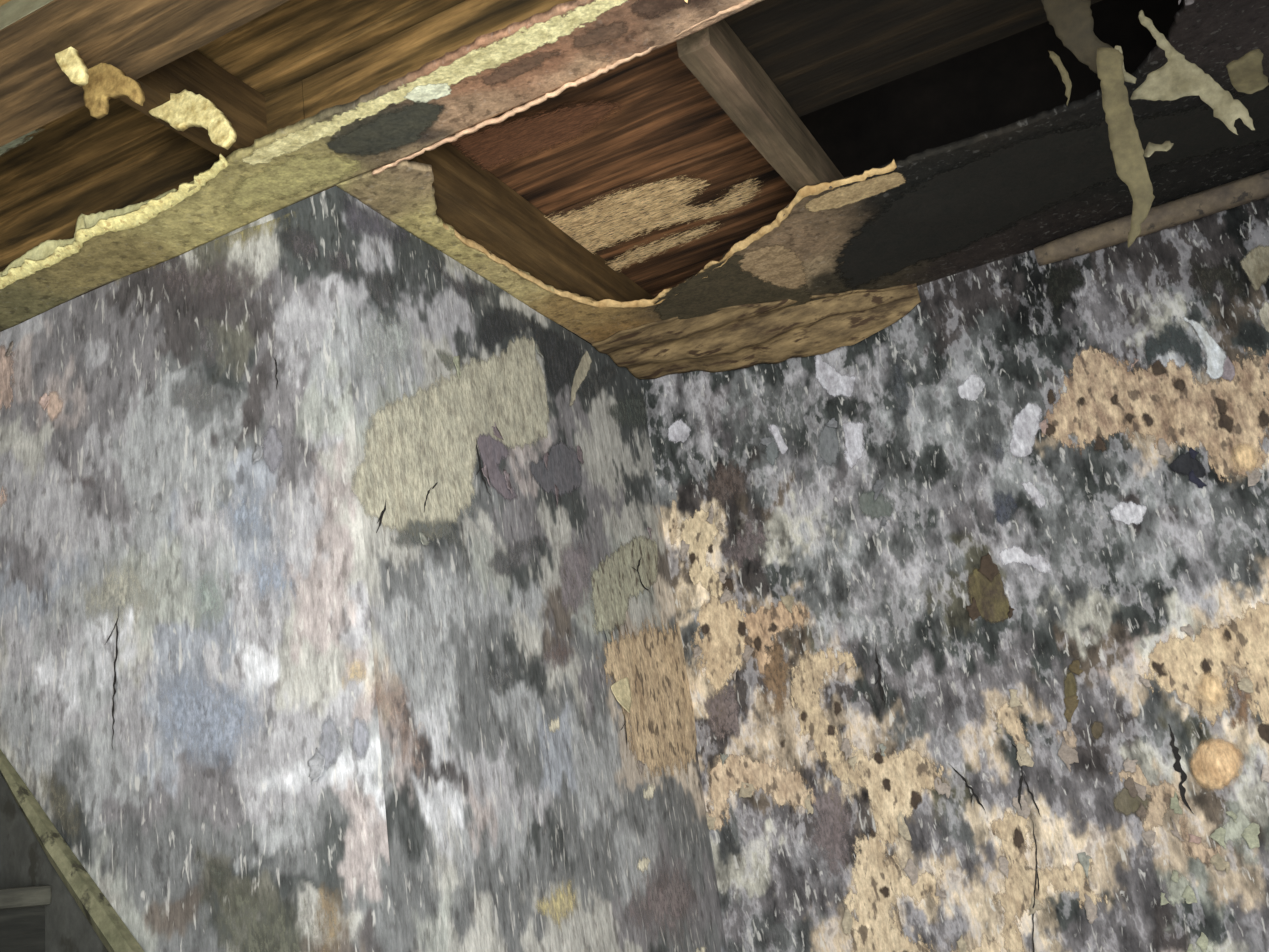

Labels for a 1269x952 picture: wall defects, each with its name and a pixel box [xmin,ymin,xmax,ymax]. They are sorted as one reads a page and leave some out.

peeling [351,337,584,545]
peeling [1010,318,1269,489]
crack [105,616,119,748]
peeling [591,500,810,800]
spalling [966,546,1051,623]
peeling [1135,599,1269,743]
peeling [706,740,816,831]
peeling [791,645,951,952]
crack [949,764,986,813]
crack [1011,740,1040,952]
peeling [951,795,1107,952]
crack [1169,725,1193,813]